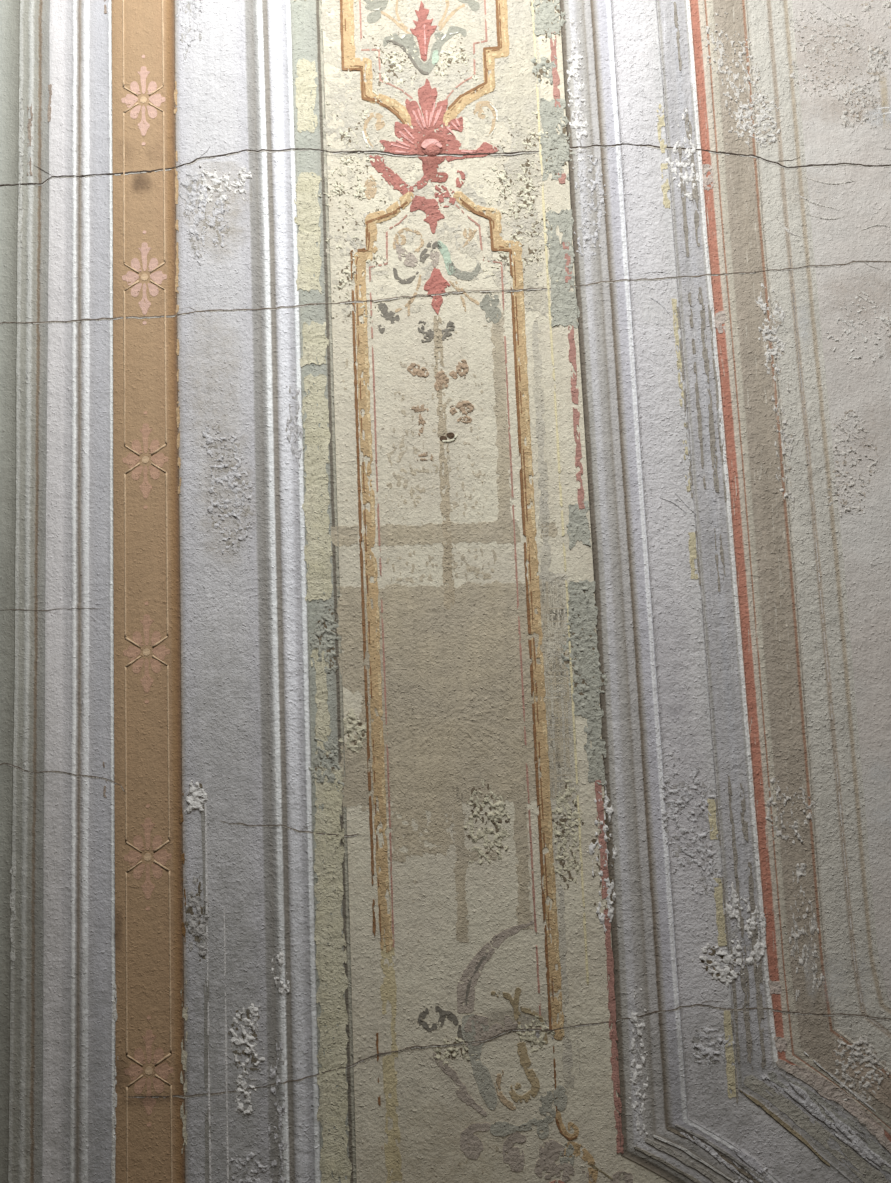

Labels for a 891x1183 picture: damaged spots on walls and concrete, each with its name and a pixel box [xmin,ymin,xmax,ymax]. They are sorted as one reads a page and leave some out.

crack [0,143,891,186]
crack [2,261,891,324]
crack [0,760,124,791]
peeling [713,877,729,949]
crack [133,1001,890,1098]